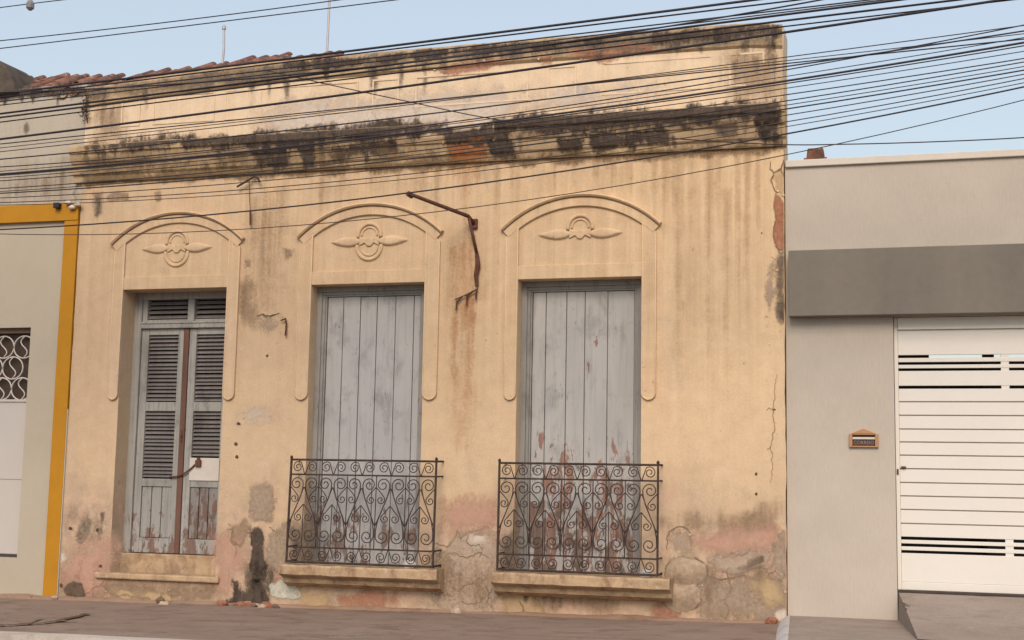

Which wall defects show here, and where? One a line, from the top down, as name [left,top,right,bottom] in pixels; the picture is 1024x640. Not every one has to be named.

water stain [0,24,782,104]
water stain [83,99,783,216]
flaking render [761,174,785,317]
water stain [776,253,784,322]
crack [768,379,776,478]
water stain [226,527,273,603]
spalling [428,497,541,612]
peeling [666,526,786,621]